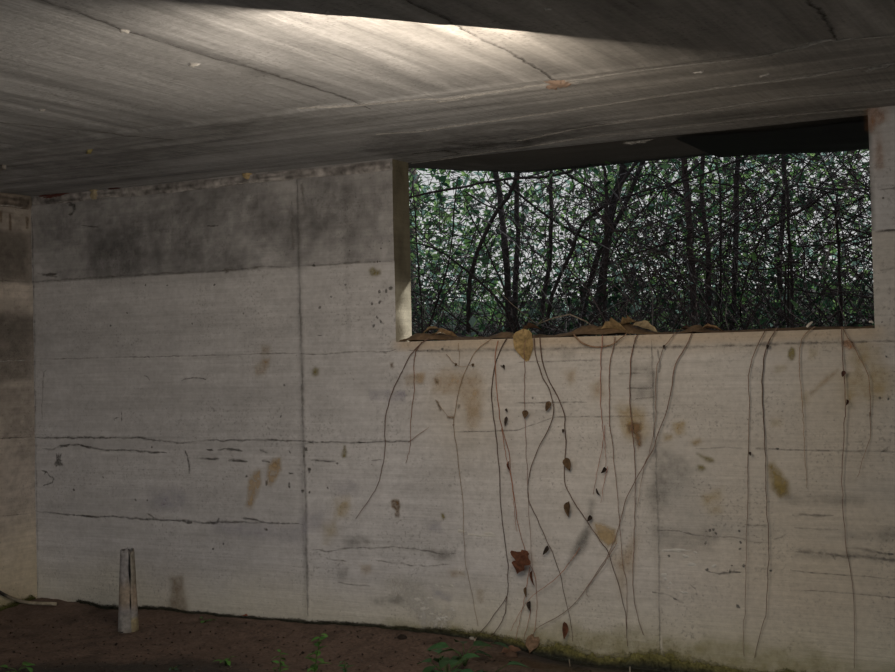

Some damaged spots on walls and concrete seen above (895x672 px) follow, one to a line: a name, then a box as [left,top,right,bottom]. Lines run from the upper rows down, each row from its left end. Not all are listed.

crack [254,2,895,109]
crack [377,63,895,164]
rust [627,420,641,446]